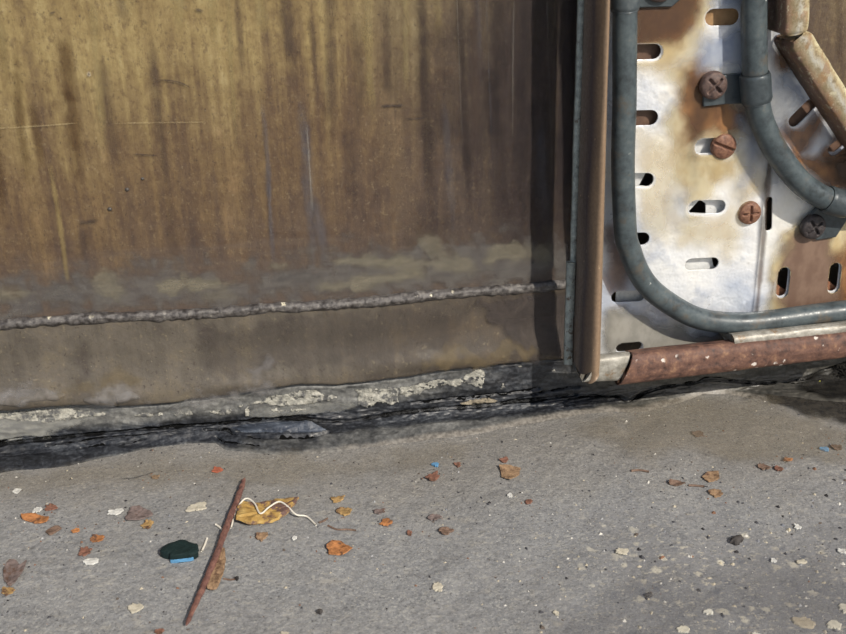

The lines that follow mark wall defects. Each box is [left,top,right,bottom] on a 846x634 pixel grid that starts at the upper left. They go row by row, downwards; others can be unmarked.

rust [637,0,749,202]
rust [785,113,846,190]
damp [0,243,569,320]
rust [771,222,846,309]
peeling [0,408,105,423]
peeling [210,390,337,416]
peeling [355,369,485,408]